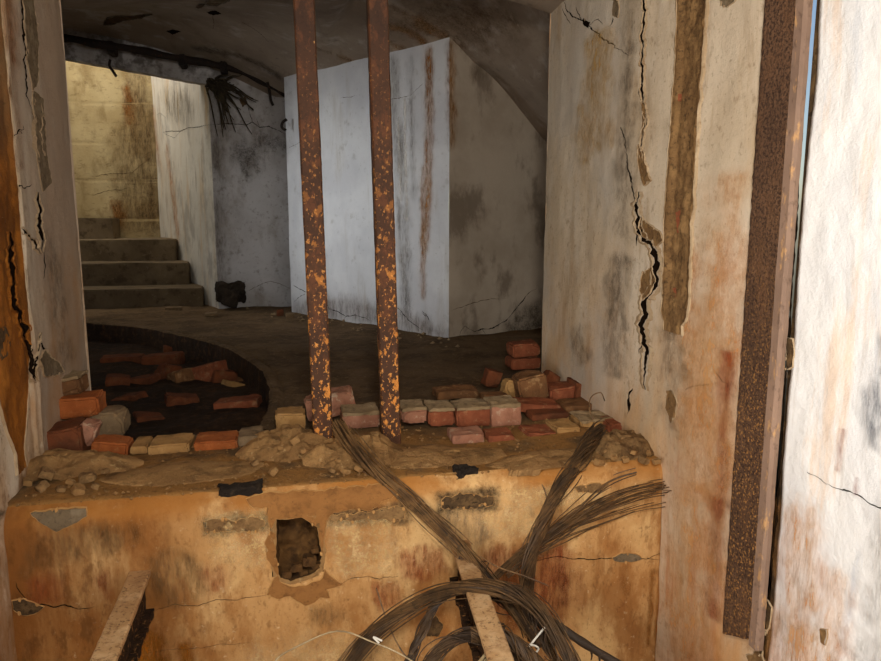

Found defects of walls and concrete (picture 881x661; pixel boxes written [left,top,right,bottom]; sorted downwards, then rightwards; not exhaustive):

corrosion [390,19,457,145]
corrosion [421,133,431,267]
crack [563,0,663,412]
spalling [636,0,736,336]
crack [2,184,52,383]
crack [456,290,533,336]
crack [769,188,799,601]
flaking render [11,598,45,616]
flaking render [202,483,407,606]
flaking render [441,491,494,510]
crack [537,554,611,562]
crack [807,472,881,509]